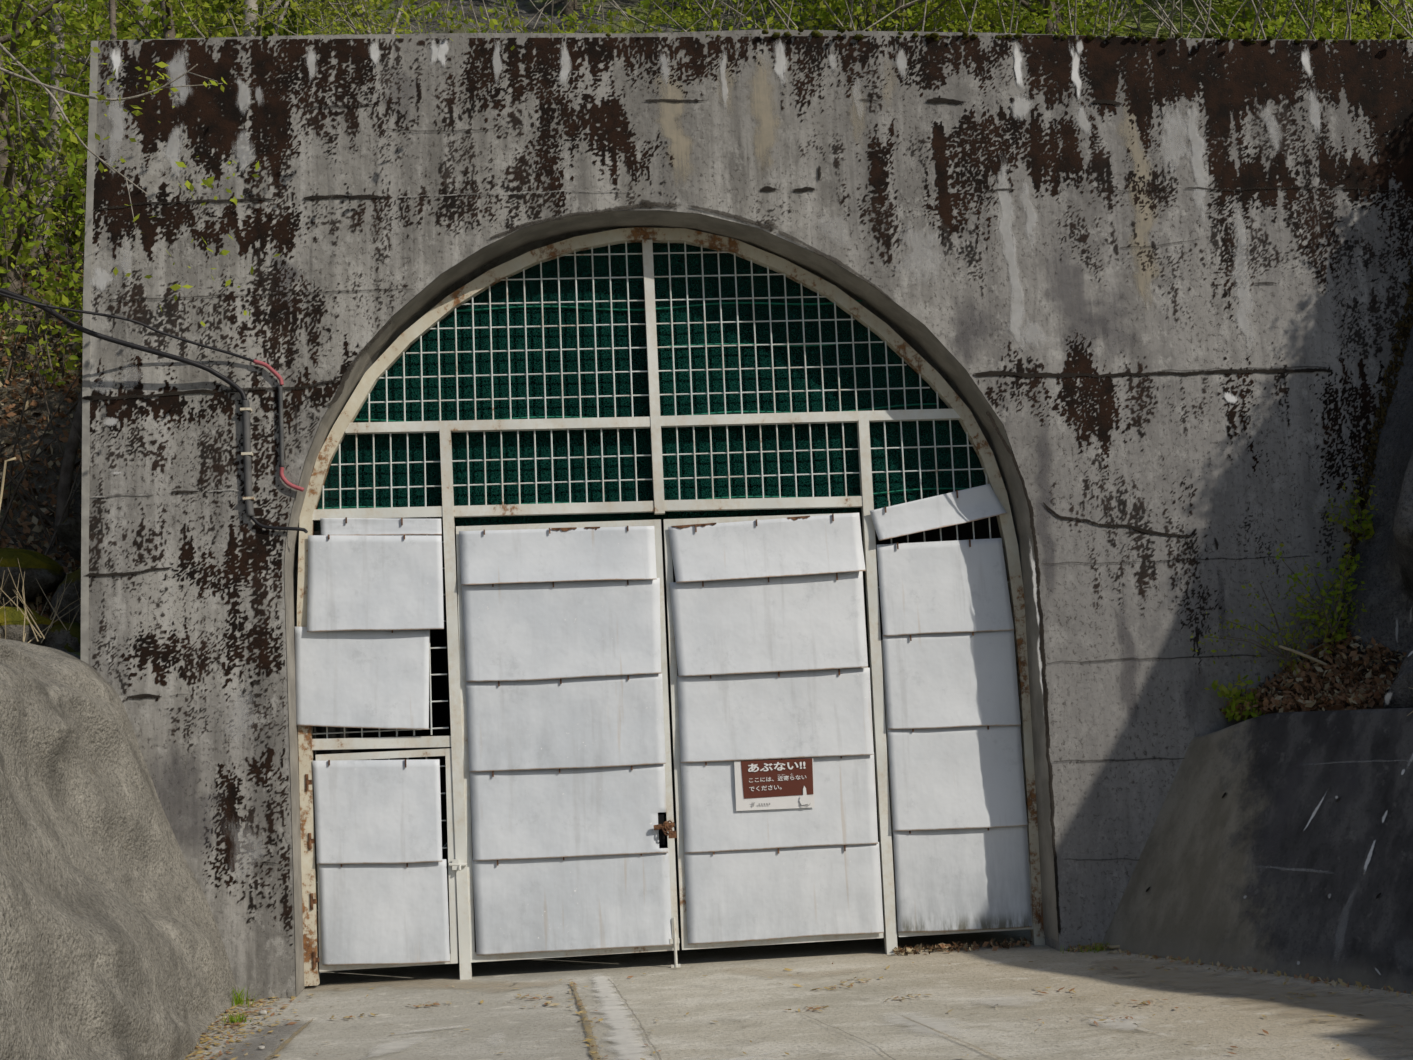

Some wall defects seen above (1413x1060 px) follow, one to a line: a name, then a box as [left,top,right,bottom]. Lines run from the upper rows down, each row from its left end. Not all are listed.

damp [111,49,121,77]
damp [561,47,571,80]
damp [995,46,1030,117]
damp [1071,41,1083,99]
damp [1301,50,1311,76]
damp [837,154,999,300]
damp [1120,113,1159,295]
crack [975,368,1333,378]
damp [159,567,285,764]
damp [1031,550,1043,692]
crack [986,412,1266,934]
damp [259,777,293,946]